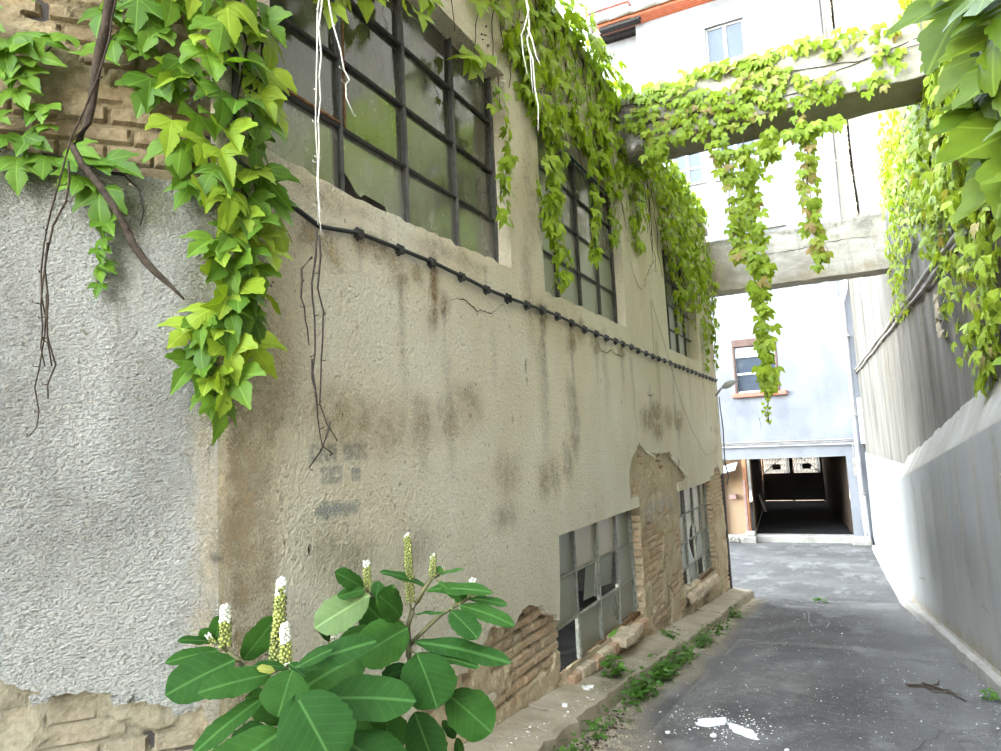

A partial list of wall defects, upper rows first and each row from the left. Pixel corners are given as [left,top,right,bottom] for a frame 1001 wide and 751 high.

flaking render [0,0,211,180]
crack [452,298,508,316]
flaking render [455,444,713,727]
flaking render [0,679,210,751]
flaking render [416,703,467,751]